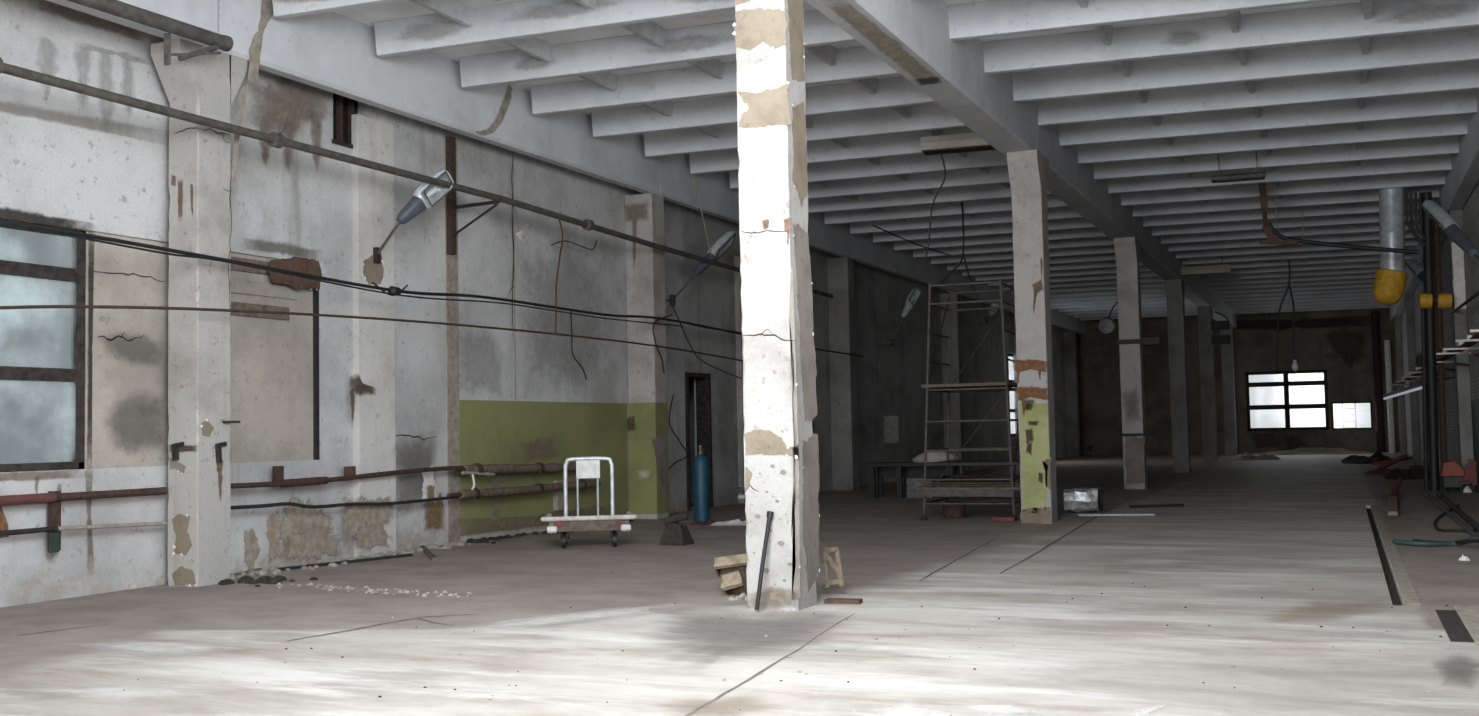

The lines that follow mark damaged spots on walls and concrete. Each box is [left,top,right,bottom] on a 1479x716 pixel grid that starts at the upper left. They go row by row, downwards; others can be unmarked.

leakage [260,80,322,168]
peeling [733,0,820,600]
leakage [114,402,158,446]
peeling [171,513,196,587]